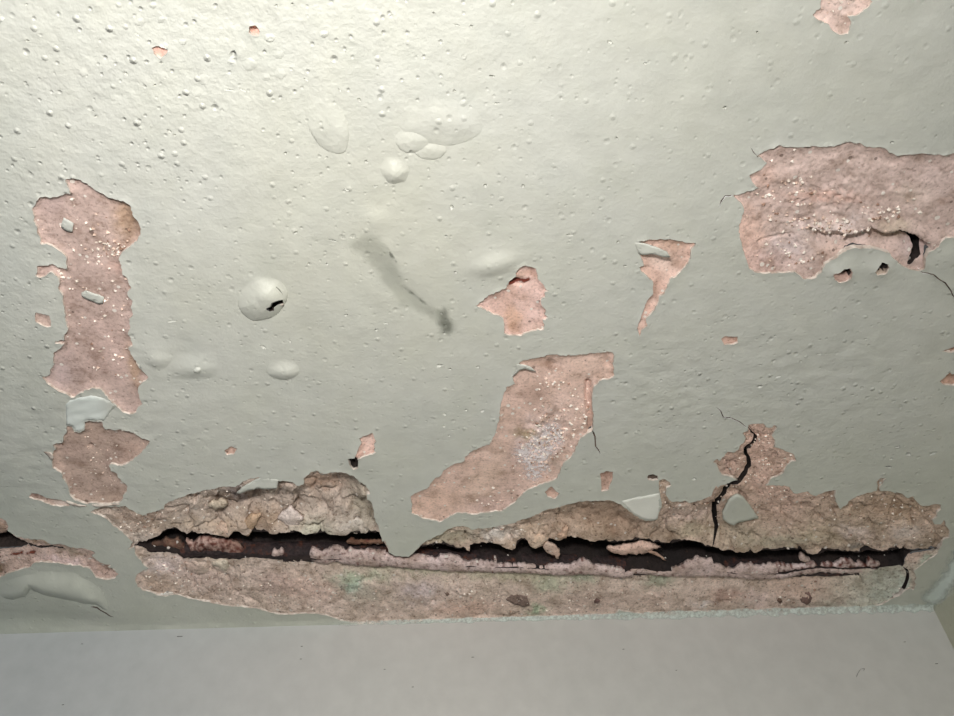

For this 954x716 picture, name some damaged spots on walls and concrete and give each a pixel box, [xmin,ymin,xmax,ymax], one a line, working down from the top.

peeling [813,0,872,44]
spalling [734,141,954,279]
crack [917,267,954,297]
spalling [29,178,950,624]
spalling [0,518,118,580]